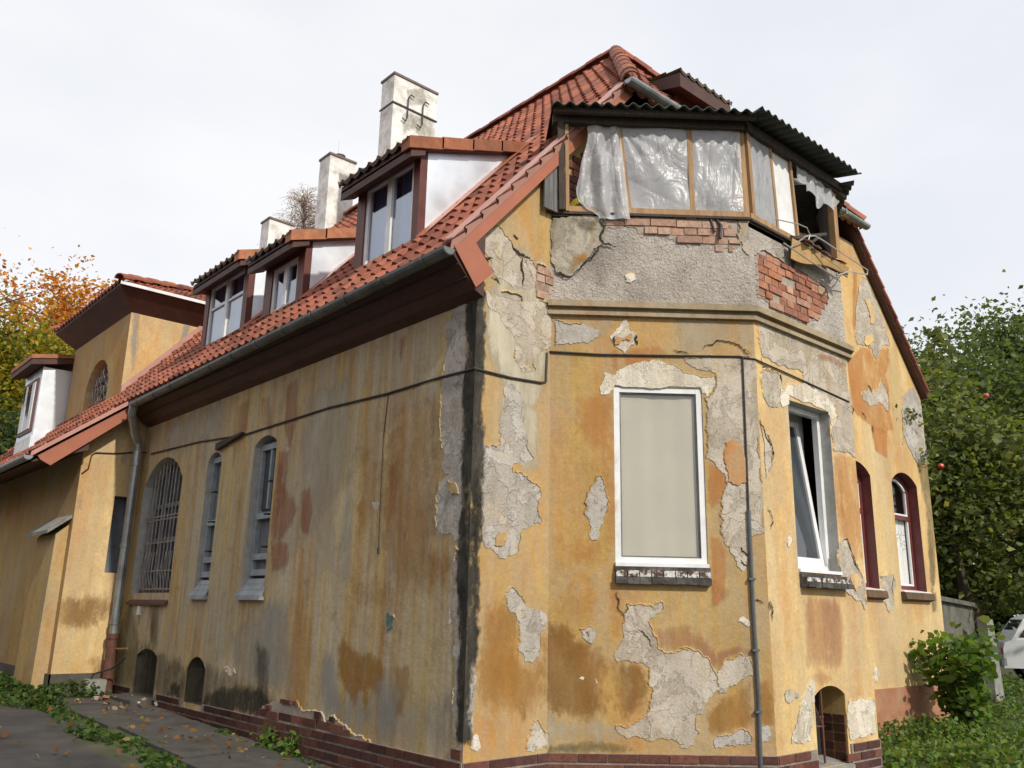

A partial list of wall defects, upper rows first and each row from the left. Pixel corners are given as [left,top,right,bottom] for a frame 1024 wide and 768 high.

peeling [485,225,637,372]
crack [555,218,621,278]
flaking render [603,217,829,323]
peeling [854,277,890,359]
rust [272,453,311,568]
peeling [435,304,481,763]
peeling [480,384,542,559]
leakage [456,249,598,745]
peeling [583,473,610,540]
peeling [600,322,927,572]
peeling [504,585,547,663]
peeling [614,600,755,748]